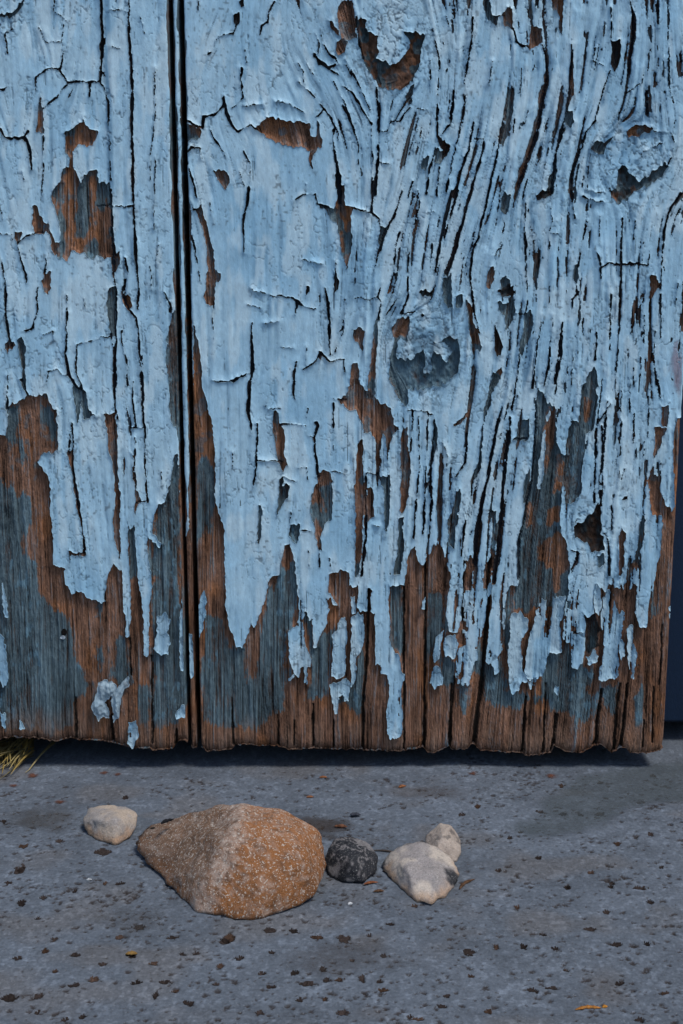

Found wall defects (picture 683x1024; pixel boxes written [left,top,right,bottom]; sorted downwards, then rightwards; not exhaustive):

peeling [313,0,425,105]
peeling [14,119,132,337]
crack [0,0,162,504]
peeling [256,116,323,169]
peeling [591,137,613,154]
peeling [609,162,668,204]
peeling [627,125,653,138]
crack [188,0,683,752]
crack [67,422,86,554]
peeling [0,266,679,755]